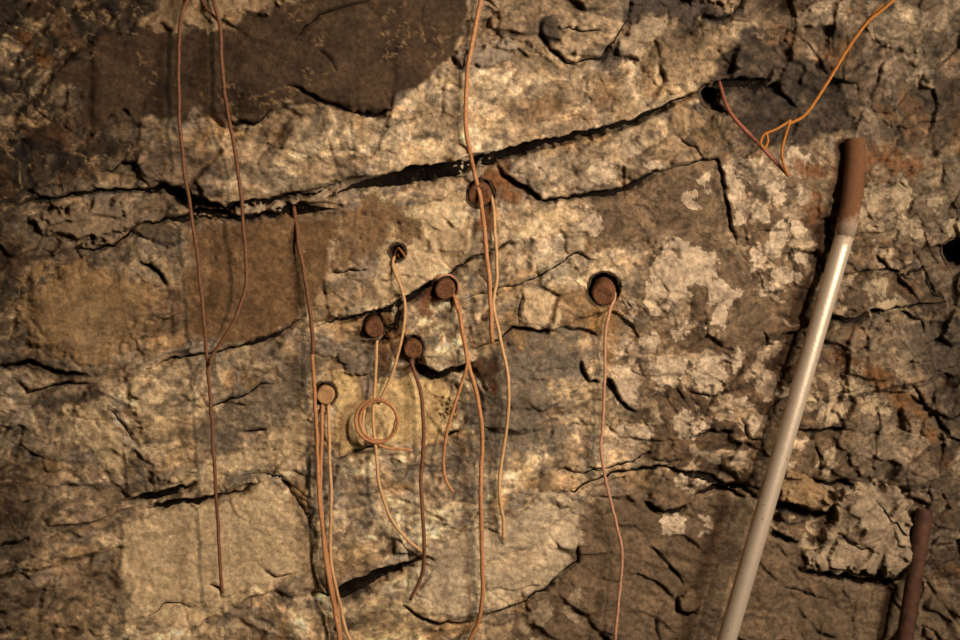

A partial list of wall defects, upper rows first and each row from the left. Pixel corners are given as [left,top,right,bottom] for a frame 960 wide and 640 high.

crack [22,72,772,251]
corrosion [481,160,522,202]
corrosion [475,206,493,231]
corrosion [419,287,443,329]
corrosion [378,316,407,370]
crack [552,452,754,514]
crack [769,532,799,543]
crack [777,501,876,550]
crack [813,478,912,537]
crack [312,558,418,598]
crack [403,542,579,625]
crack [786,568,905,598]